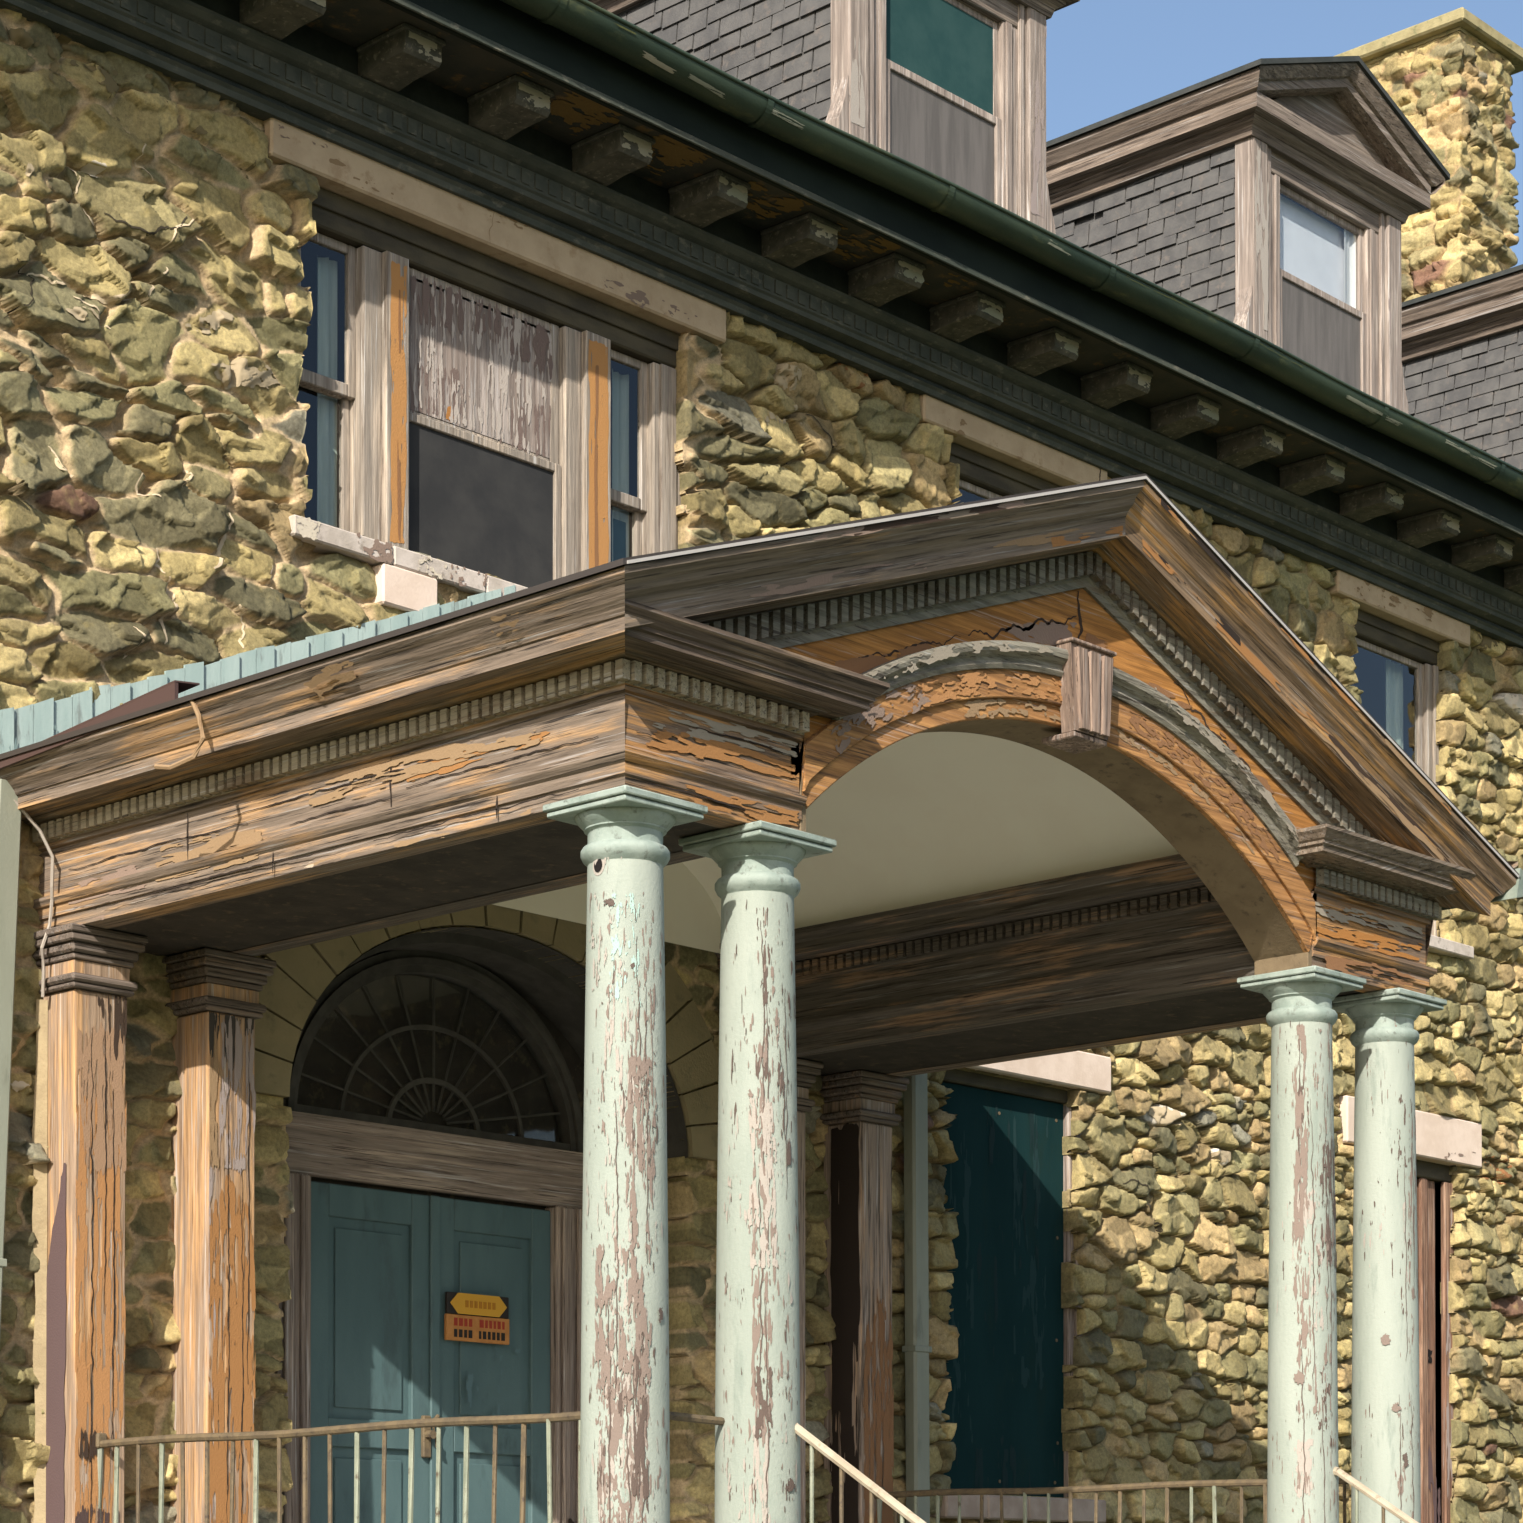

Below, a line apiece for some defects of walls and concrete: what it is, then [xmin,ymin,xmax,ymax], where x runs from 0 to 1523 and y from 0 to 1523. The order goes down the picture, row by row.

peeling [390,261,555,543]
peeling [75,1022,127,1523]
peeling [208,1015,256,1523]
peeling [583,891,668,1523]
peeling [720,896,799,1523]
peeling [863,1290,894,1523]
peeling [1271,1021,1373,1523]
peeling [1362,1085,1417,1357]
peeling [1391,1392,1420,1456]
peeling [1395,1466,1420,1518]